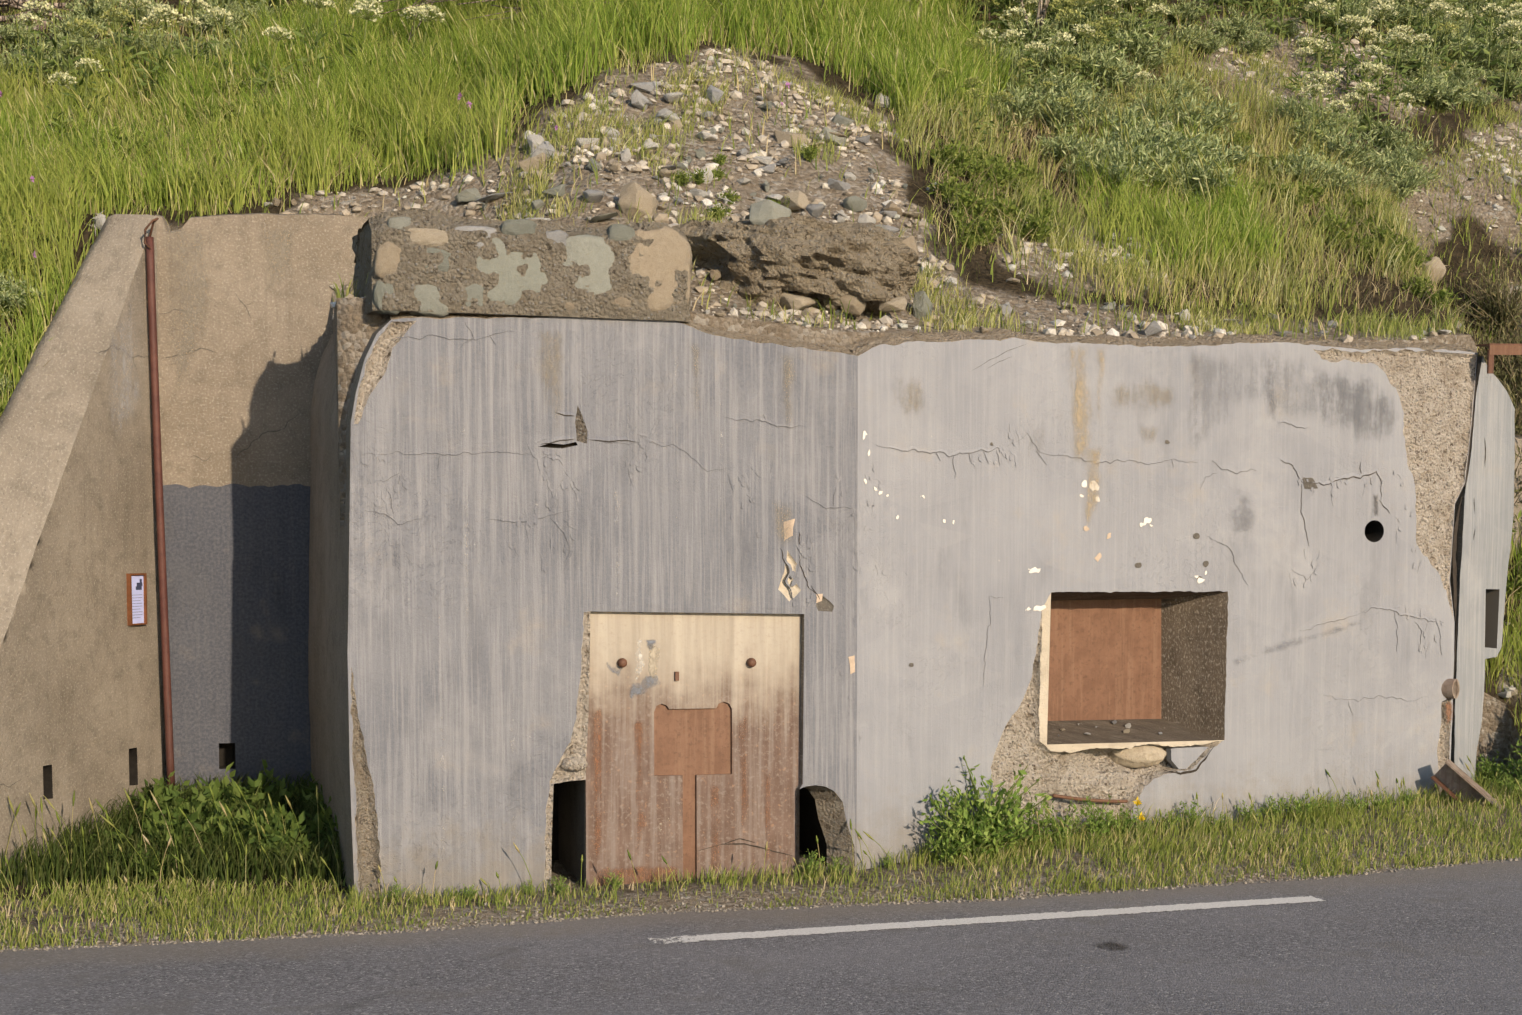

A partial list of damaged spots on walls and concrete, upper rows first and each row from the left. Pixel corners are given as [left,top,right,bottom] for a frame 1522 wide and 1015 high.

spalling [354,321,416,424]
crack [362,406,733,525]
peeling [778,519,846,614]
crack [780,487,852,600]
crack [876,420,1390,585]
crack [1299,360,1486,715]
spalling [1313,348,1477,620]
spalling [544,611,590,890]
peeling [835,655,855,676]
spalling [991,605,1222,843]